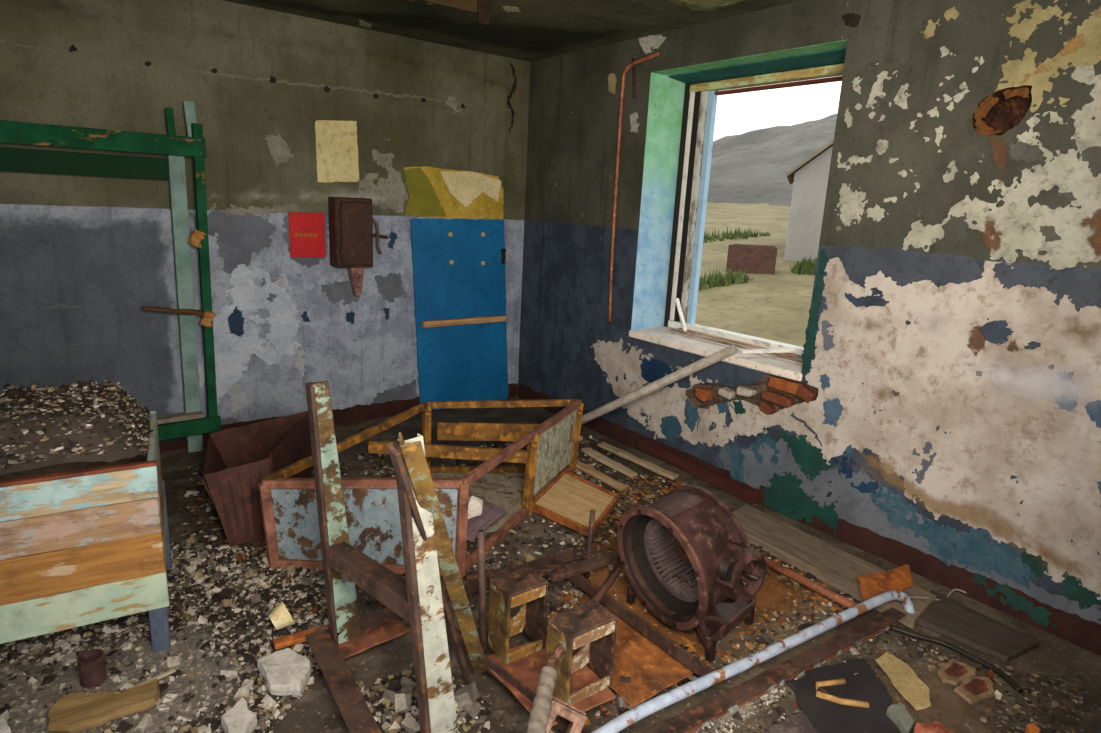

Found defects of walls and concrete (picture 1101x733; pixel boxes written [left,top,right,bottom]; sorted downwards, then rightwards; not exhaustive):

crack [0,39,520,134]
peeling [265,135,294,166]
peeling [357,149,408,213]
peeling [189,203,329,425]
peeling [321,281,360,324]
peeling [374,273,407,320]
peeling [591,0,1101,627]
peeling [371,379,417,404]